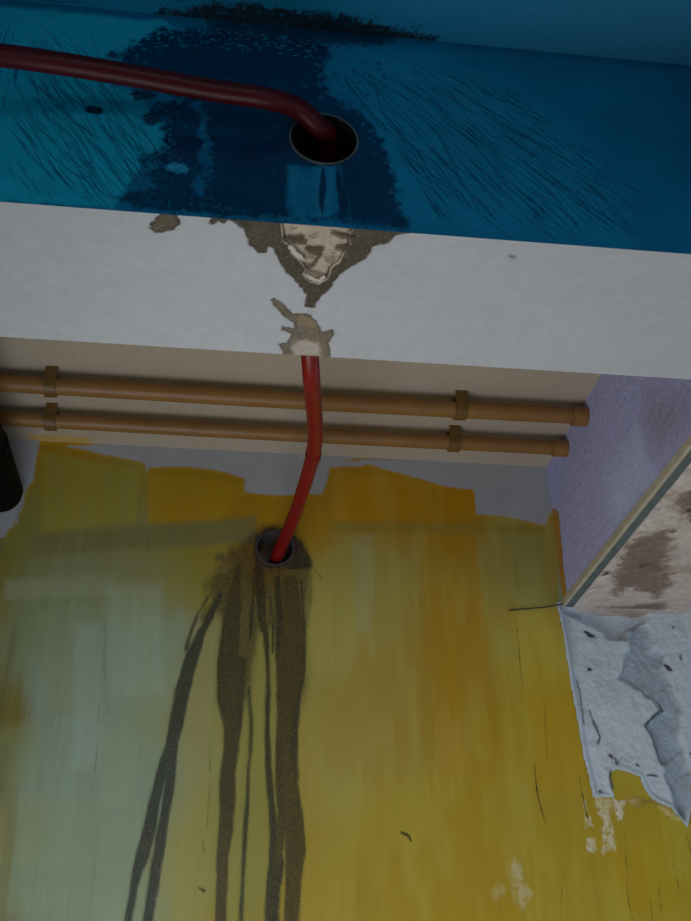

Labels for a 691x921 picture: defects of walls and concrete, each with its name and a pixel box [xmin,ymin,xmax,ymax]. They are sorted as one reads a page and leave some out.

water stain [102,0,442,232]
flaking render [208,218,409,357]
water stain [124,520,324,921]
flaking render [556,602,691,856]